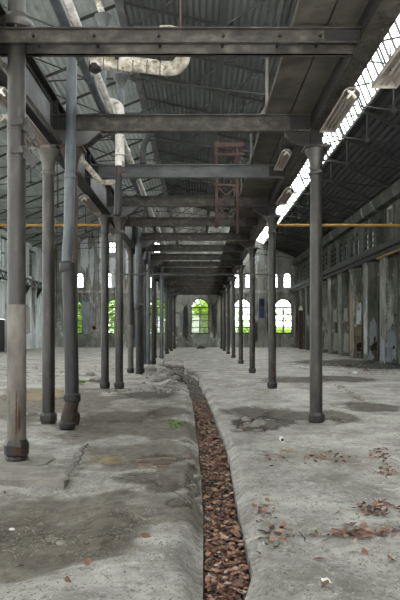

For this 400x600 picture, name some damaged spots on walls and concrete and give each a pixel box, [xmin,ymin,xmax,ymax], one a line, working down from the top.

peeling [354,302,397,364]
leakage [229,407,308,430]
leakage [322,401,399,423]